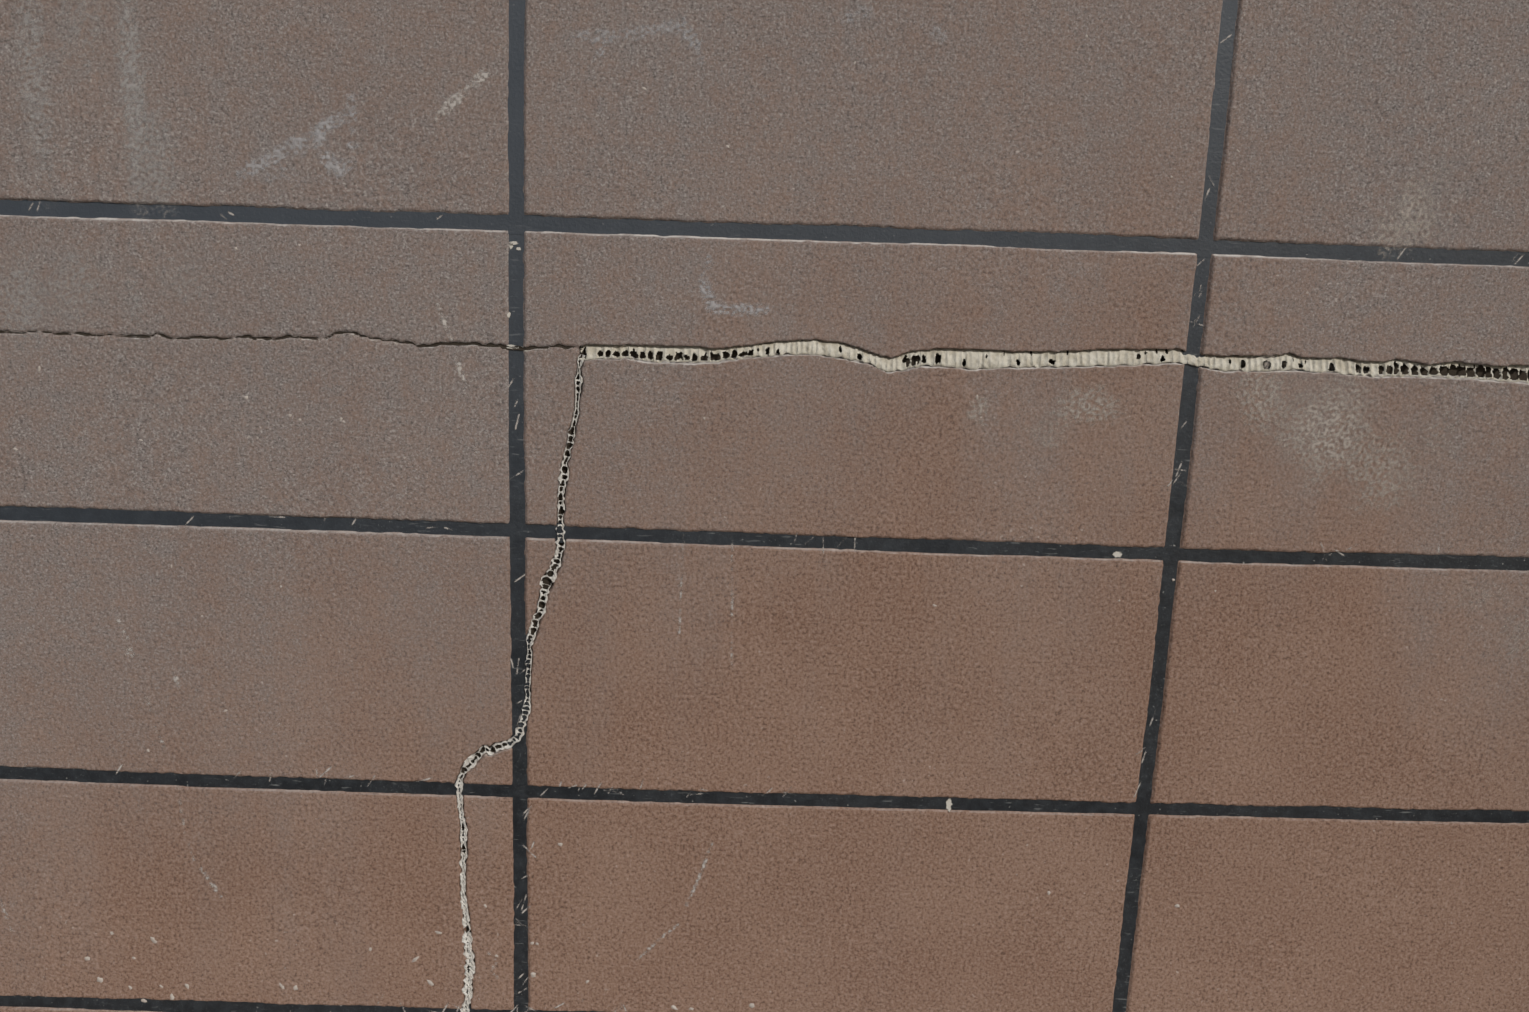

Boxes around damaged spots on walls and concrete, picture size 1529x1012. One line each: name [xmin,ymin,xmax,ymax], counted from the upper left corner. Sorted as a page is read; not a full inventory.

crack [0,330,1529,1012]